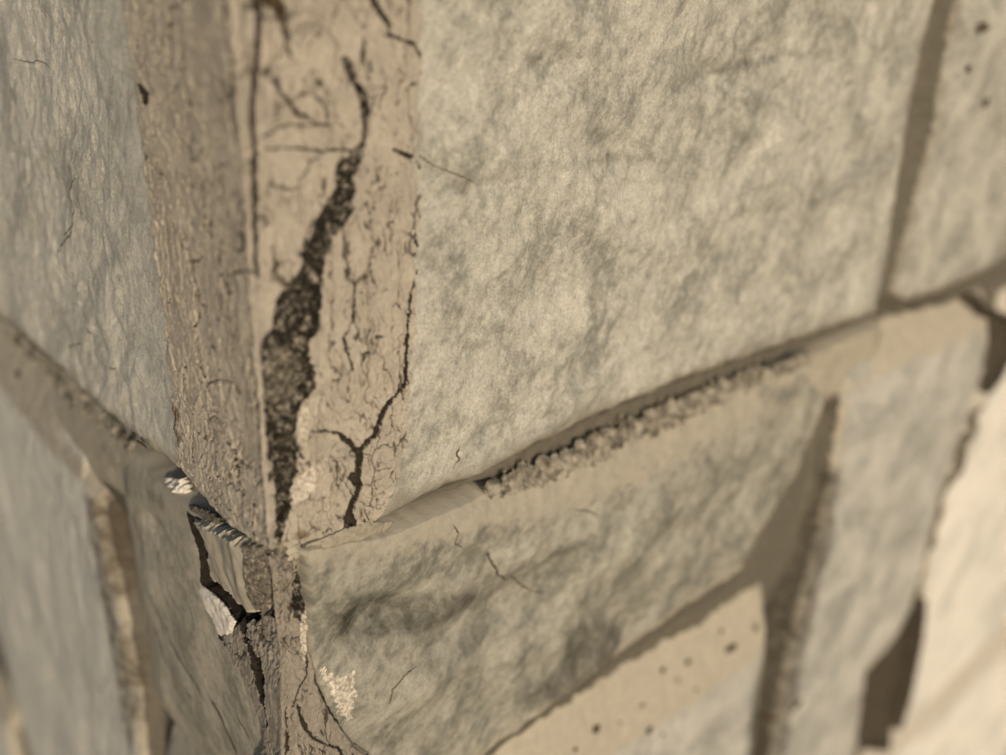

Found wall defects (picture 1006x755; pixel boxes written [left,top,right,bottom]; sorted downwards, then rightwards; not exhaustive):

crack [392,148,477,184]
crack [165,0,421,755]
peeling [199,588,237,636]